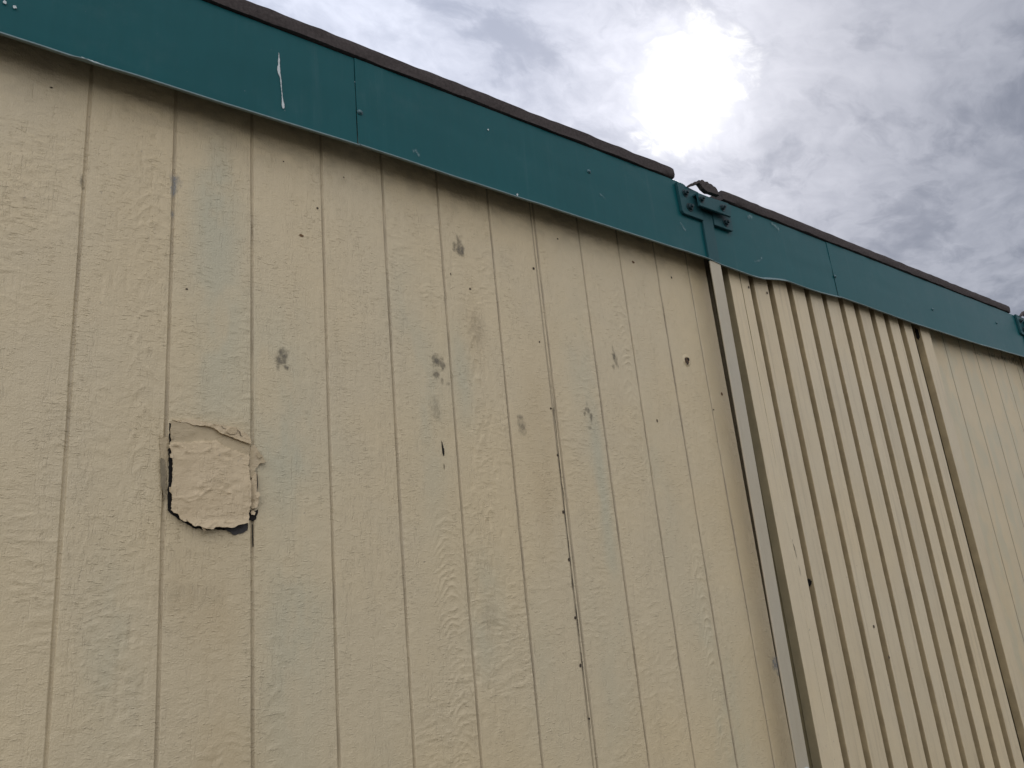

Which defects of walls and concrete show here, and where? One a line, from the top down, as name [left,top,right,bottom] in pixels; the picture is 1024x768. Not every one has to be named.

peeling [159,419,266,535]